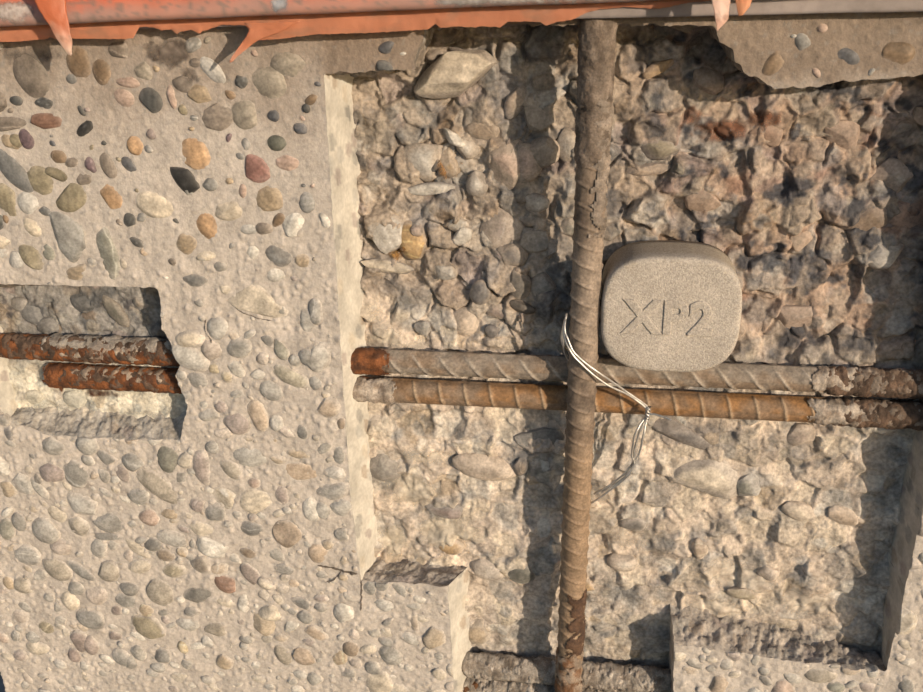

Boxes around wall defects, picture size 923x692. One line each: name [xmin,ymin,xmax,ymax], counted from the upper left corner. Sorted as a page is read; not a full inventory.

peeling [0,0,730,63]
peeling [735,0,752,16]
spalling [0,284,188,440]
spalling [324,18,923,692]